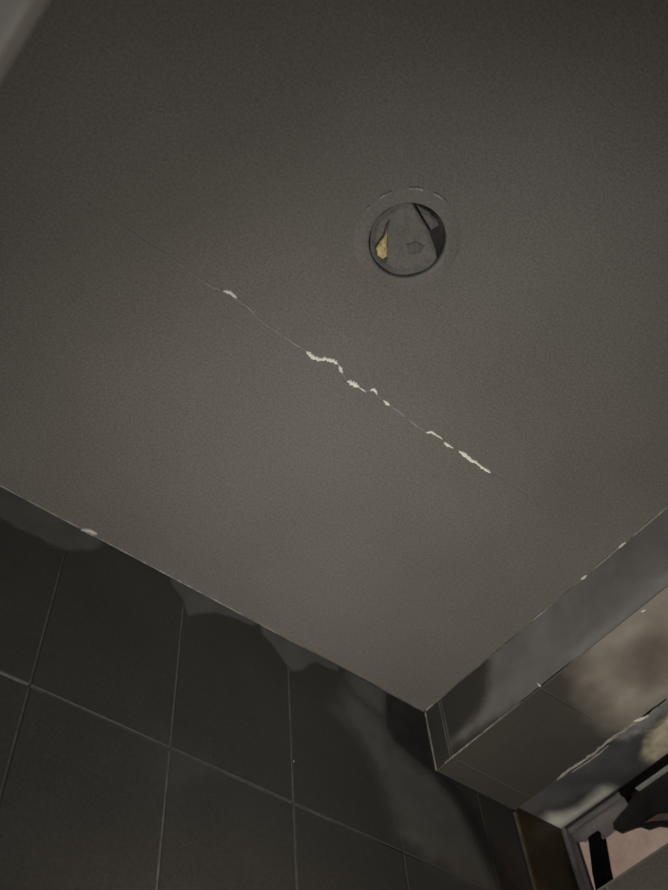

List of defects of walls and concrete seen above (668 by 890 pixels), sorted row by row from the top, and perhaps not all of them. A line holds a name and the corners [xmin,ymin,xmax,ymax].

crack [110,213,544,509]